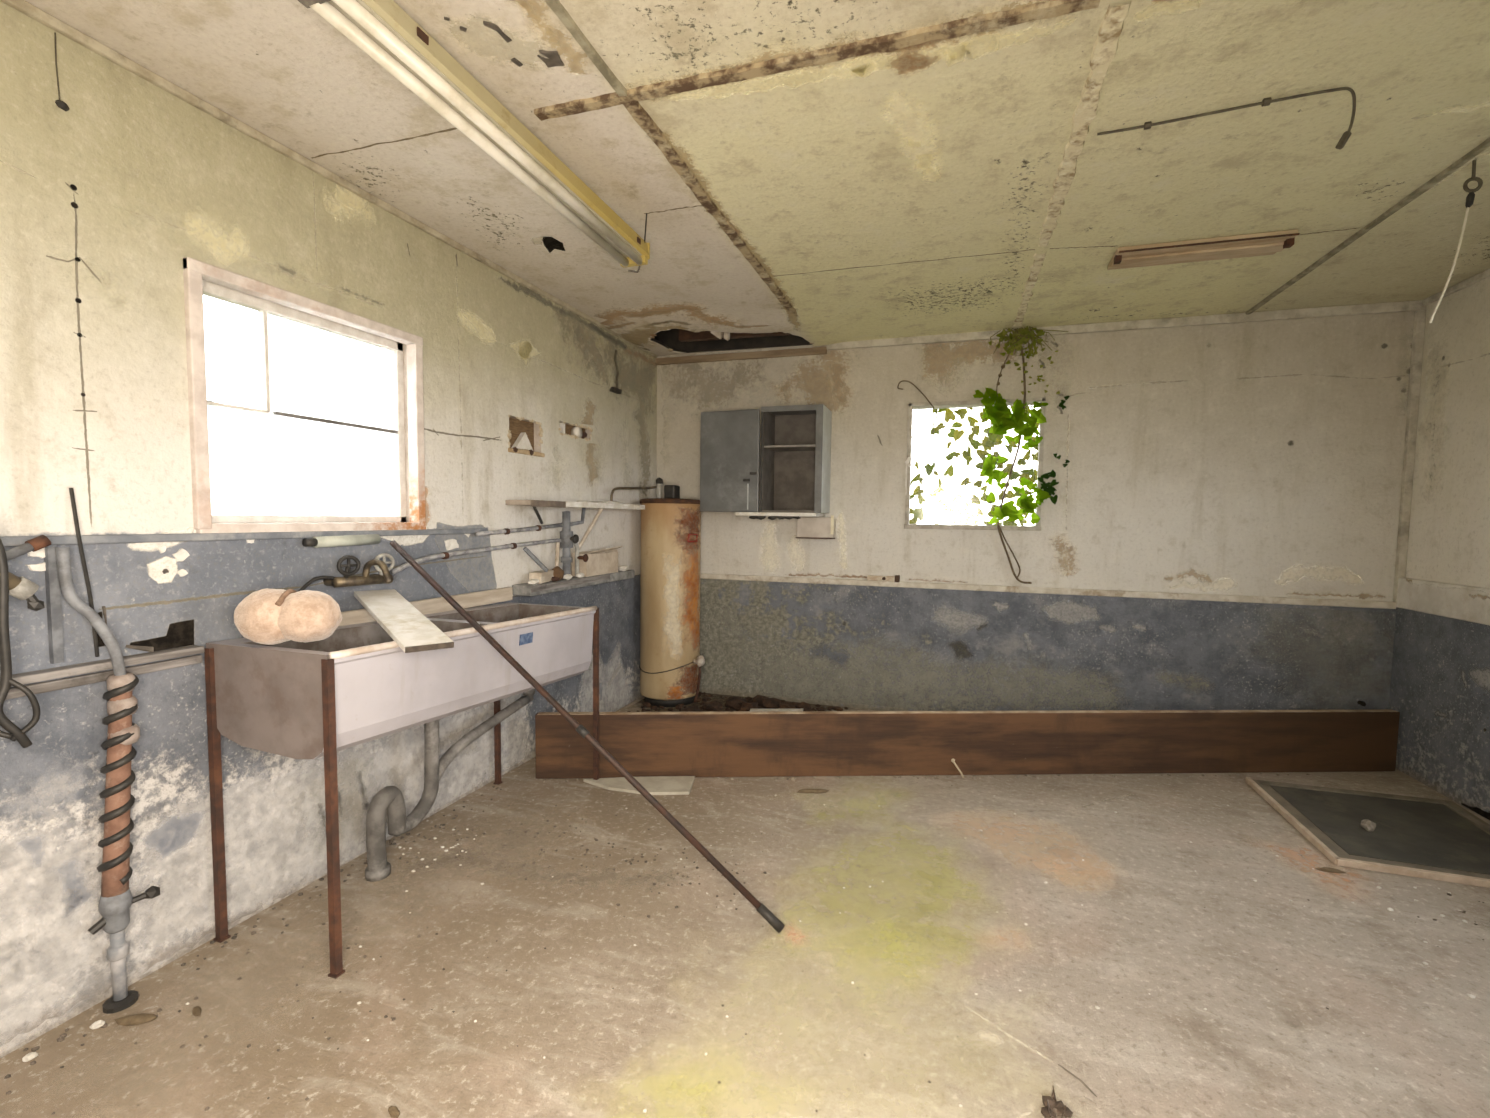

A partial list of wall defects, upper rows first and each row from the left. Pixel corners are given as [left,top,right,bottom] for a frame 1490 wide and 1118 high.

peeling [444,17,564,68]
damp [501,277,760,494]